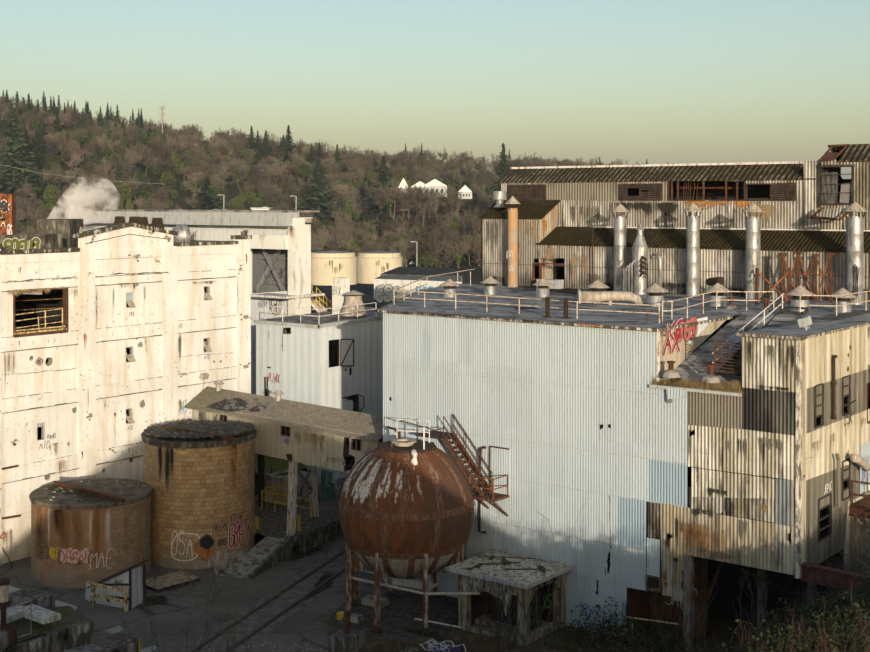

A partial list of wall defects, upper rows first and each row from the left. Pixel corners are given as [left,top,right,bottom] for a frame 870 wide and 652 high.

leakage [158,448,173,483]